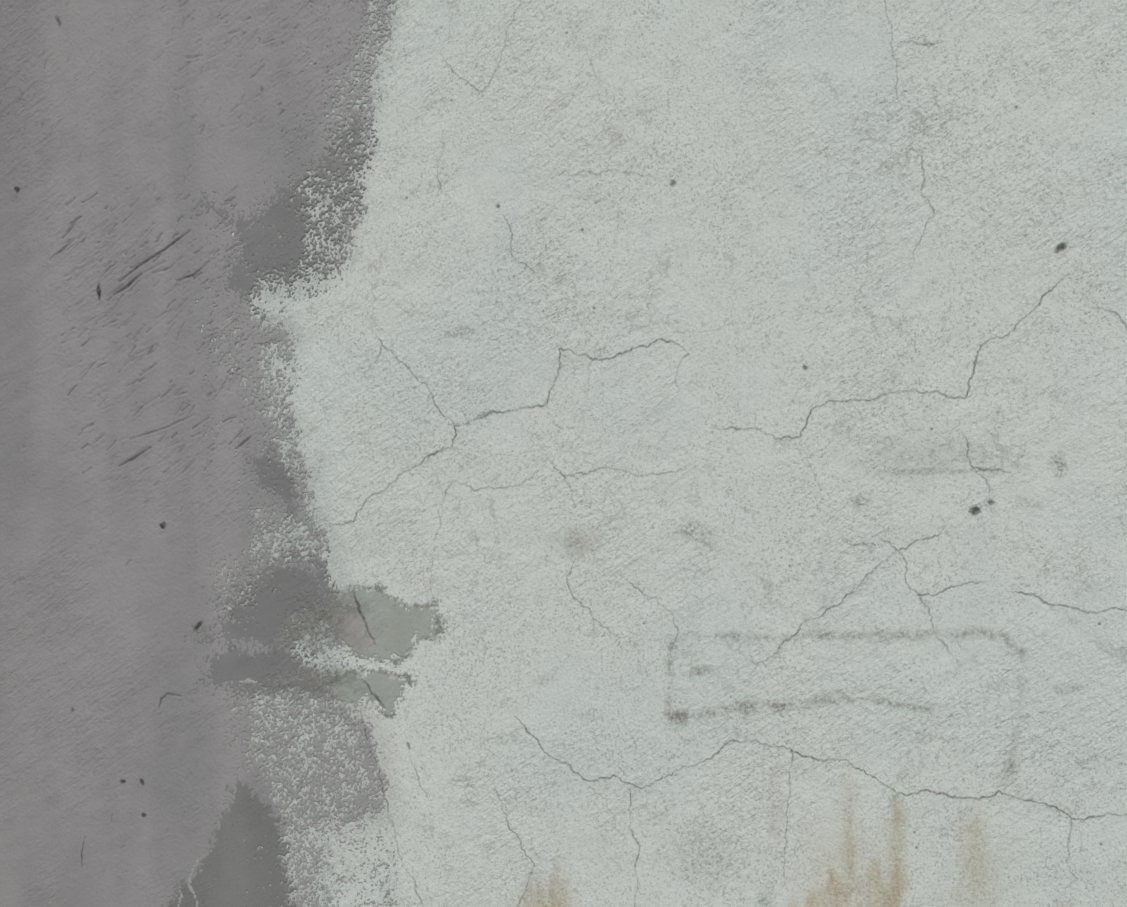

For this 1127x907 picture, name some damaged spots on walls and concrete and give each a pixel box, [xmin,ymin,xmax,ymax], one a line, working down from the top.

spalling [285,581,448,719]